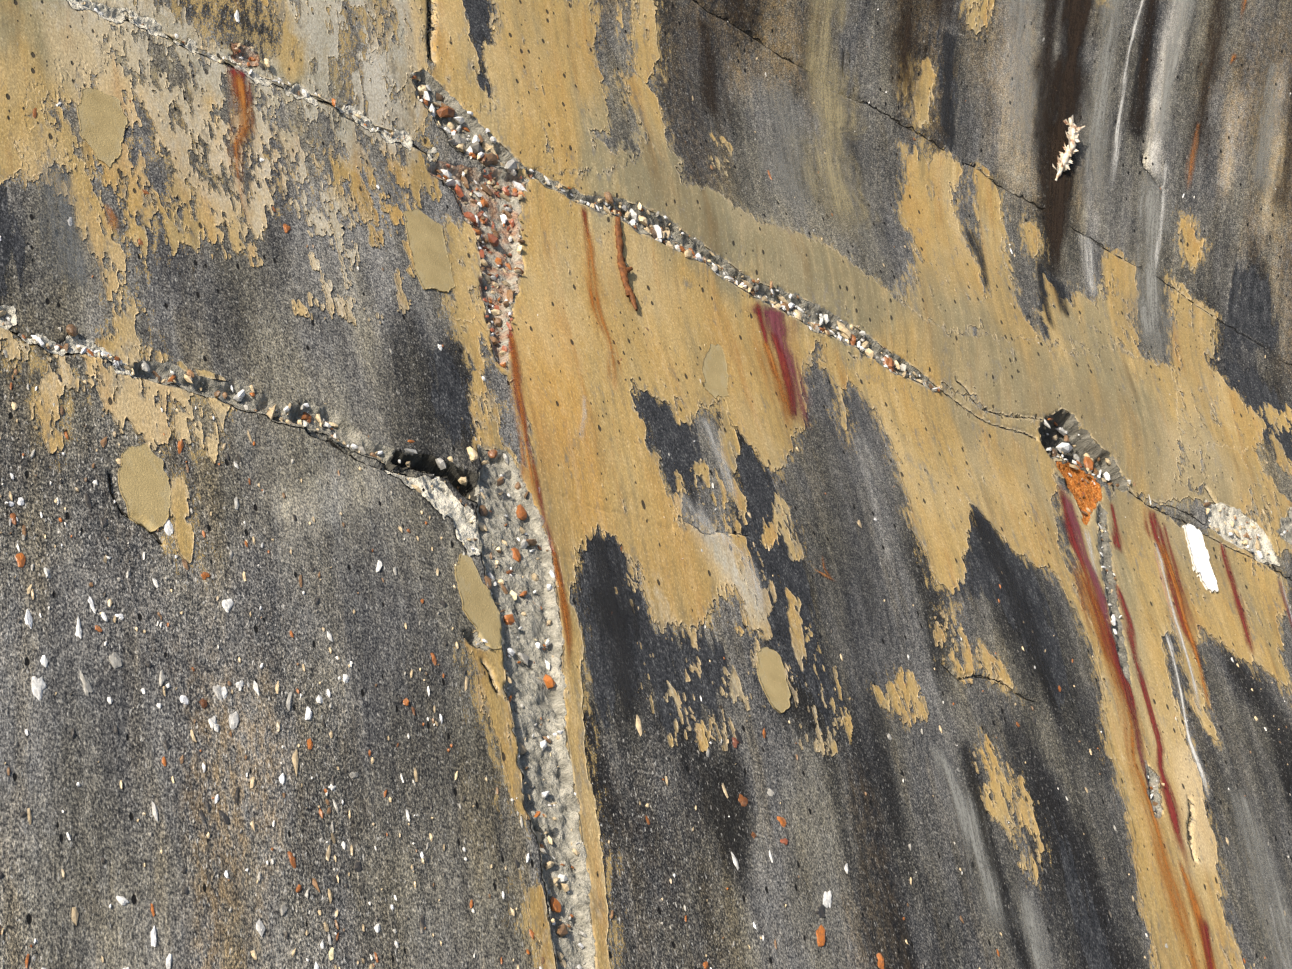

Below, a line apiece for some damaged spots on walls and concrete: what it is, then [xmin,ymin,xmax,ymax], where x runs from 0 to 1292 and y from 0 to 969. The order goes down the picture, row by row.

corrosion [230,68,250,177]
crack [125,19,433,158]
crack [426,0,434,59]
corrosion [583,211,615,365]
corrosion [754,304,806,415]
peeling [872,655,942,740]
water stain [948,504,1077,712]
water stain [1157,548,1207,787]
crack [1128,490,1292,581]
peeling [285,766,361,969]
water stain [933,750,1002,917]
peeling [972,734,1044,887]